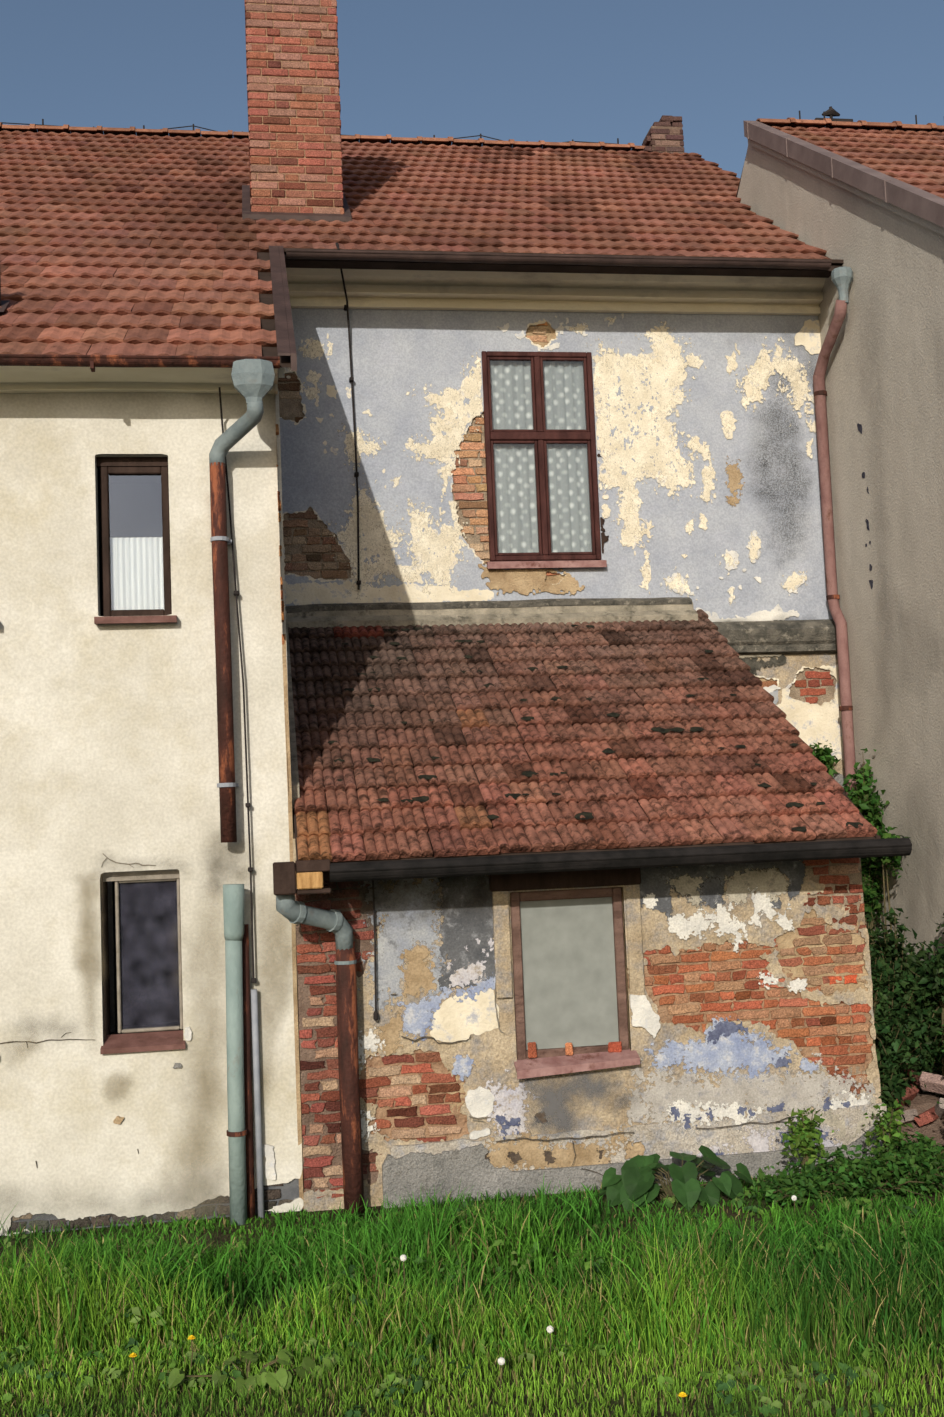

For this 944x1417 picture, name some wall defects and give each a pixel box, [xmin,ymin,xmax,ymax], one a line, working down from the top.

peeling [275,333,585,645]
peeling [497,313,821,622]
peeling [755,664,846,793]
spalling [5,1194,230,1236]
spalling [255,924,344,1215]
spalling [295,880,385,978]
spalling [358,938,645,1184]
peeling [666,1099,785,1130]
spalling [627,858,874,1111]